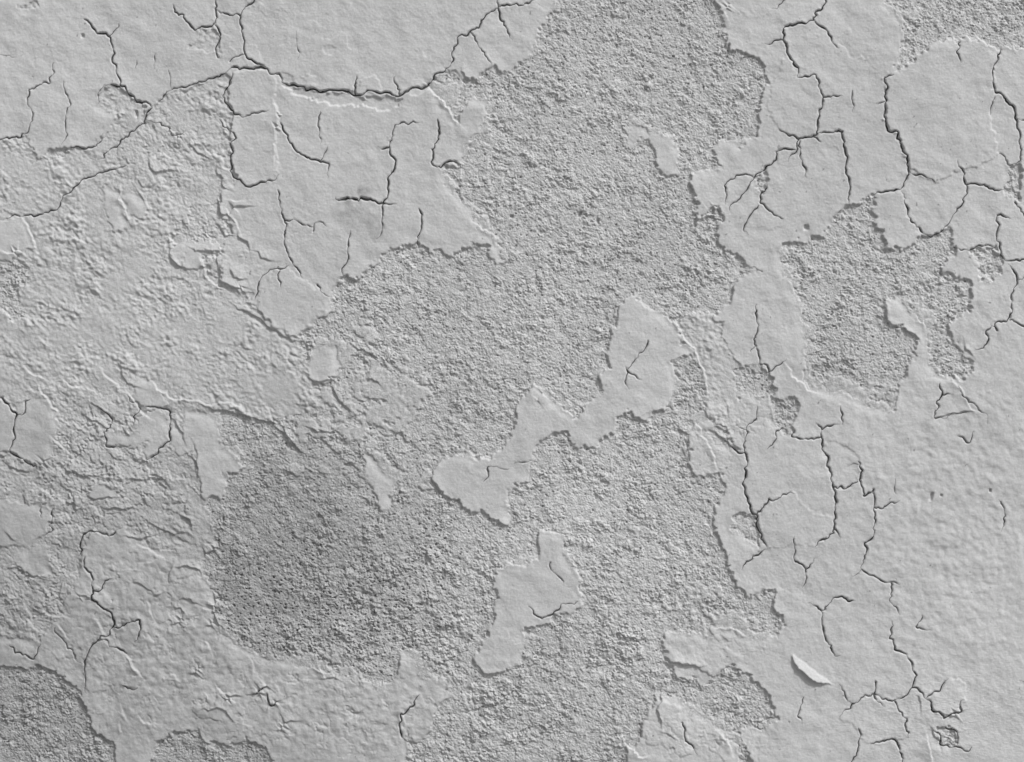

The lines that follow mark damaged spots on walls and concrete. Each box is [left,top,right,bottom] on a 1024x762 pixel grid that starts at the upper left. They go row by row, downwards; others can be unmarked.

crack [0,0,532,297]
crack [724,0,1024,350]
crack [0,397,41,468]
crack [98,398,171,460]
peeling [0,0,803,762]
crack [750,304,783,372]
peeling [780,194,1004,413]
crack [934,384,983,443]
crack [9,528,141,694]
crack [530,562,578,619]
crack [732,405,972,762]